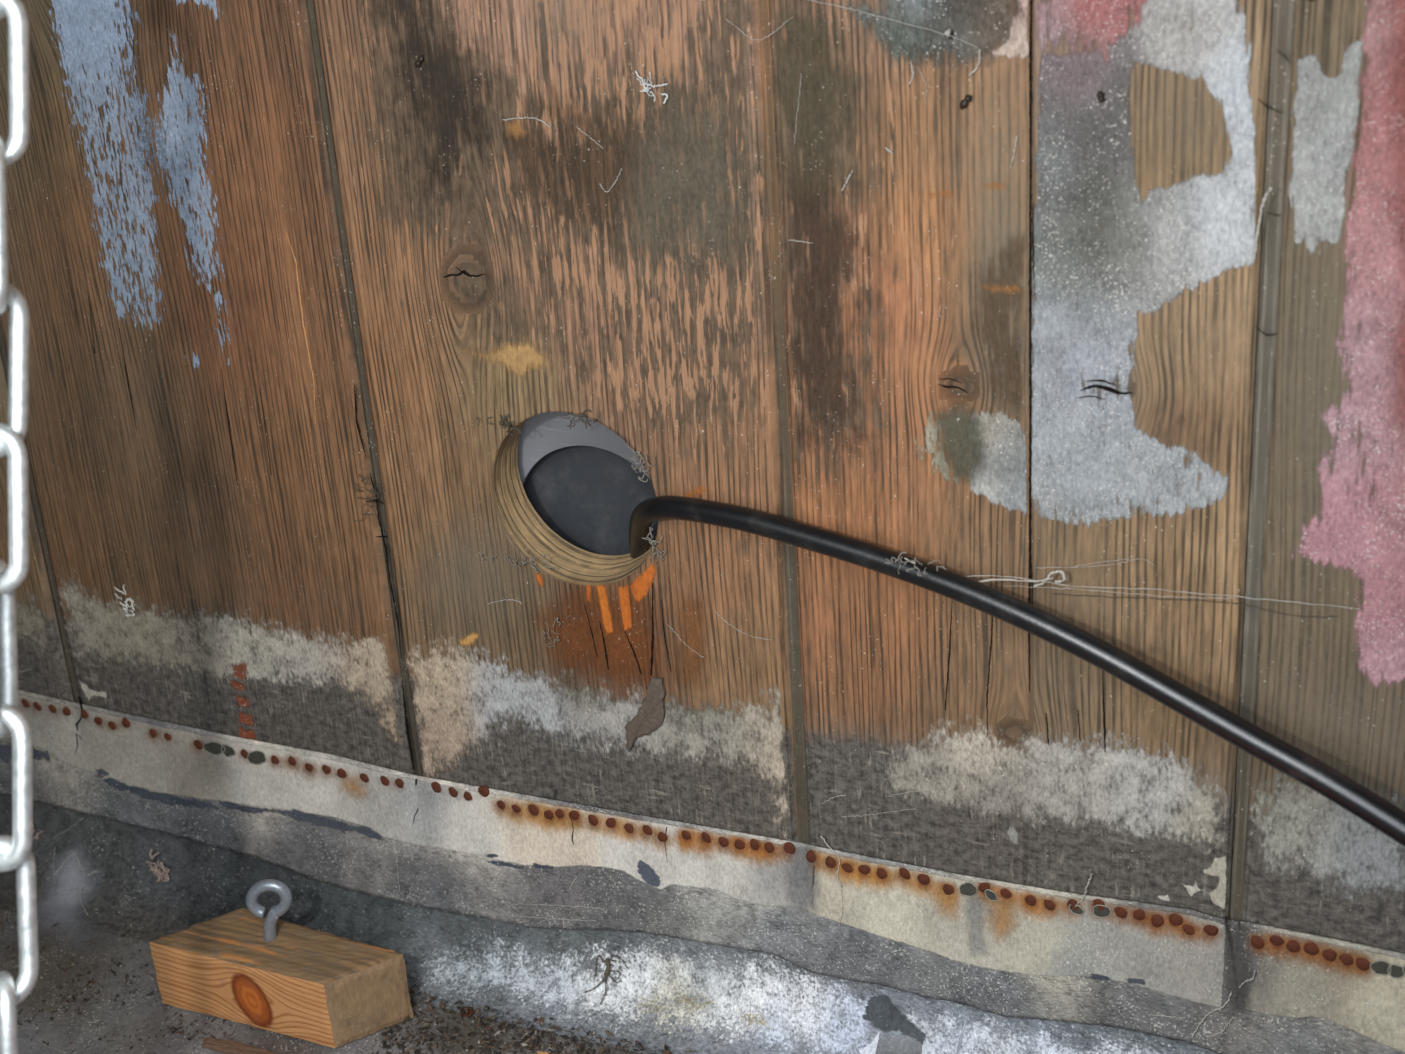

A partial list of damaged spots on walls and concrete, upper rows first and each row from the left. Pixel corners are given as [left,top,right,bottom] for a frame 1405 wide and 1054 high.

peeling [49,0,231,366]
leakage [512,92,735,262]
leakage [778,5,855,432]
peeling [915,0,1256,527]
peeling [1288,0,1405,688]
crack [354,385,419,825]
leakage [16,563,1226,1008]
corrosion [496,802,793,860]
corrosion [810,851,956,911]
corrosion [978,885,1072,932]
corrosion [1251,935,1371,975]
leakage [1251,775,1405,899]